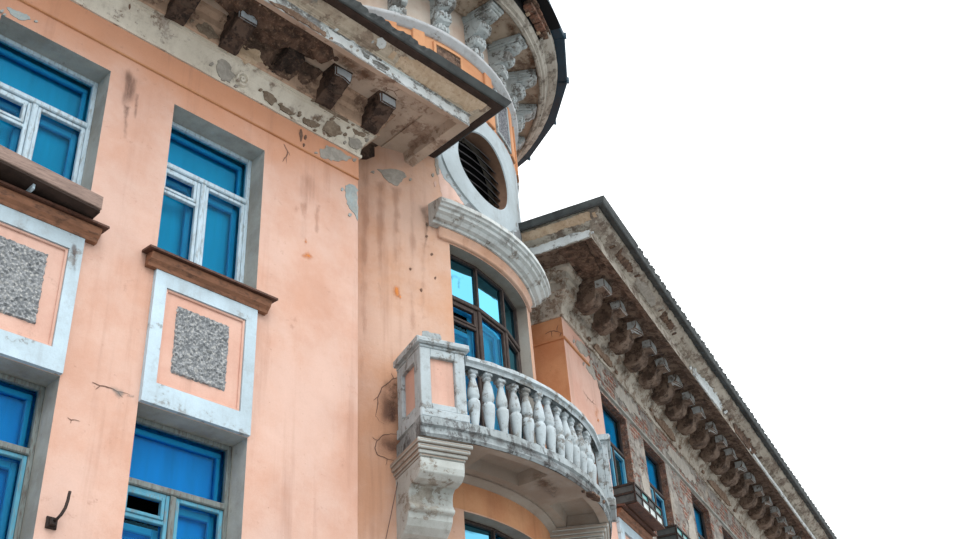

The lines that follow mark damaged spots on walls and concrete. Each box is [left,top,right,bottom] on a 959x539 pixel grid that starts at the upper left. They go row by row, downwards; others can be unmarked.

peeling [190,19,219,39]
spalling [209,0,396,162]
peeling [370,169,412,186]
peeling [341,184,359,221]
spalling [609,245,641,278]
spalling [658,309,677,335]
crack [373,374,397,464]
flaking render [573,336,752,539]